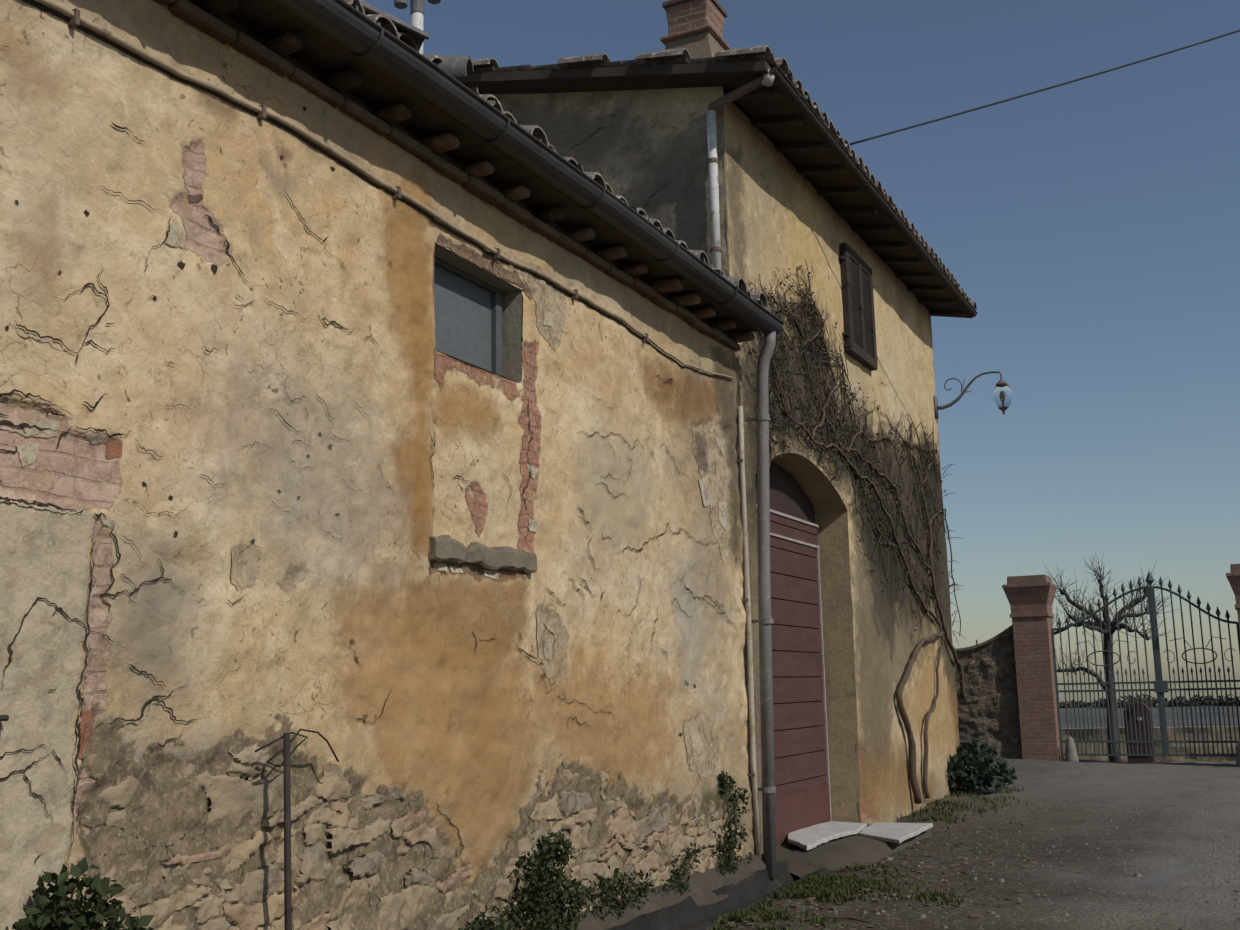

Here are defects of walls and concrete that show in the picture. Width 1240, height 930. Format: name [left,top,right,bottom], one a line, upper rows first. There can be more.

crack [15,270,116,365]
crack [102,186,174,299]
spalling [166,140,232,274]
crack [205,215,380,353]
crack [283,189,349,275]
crack [242,384,397,494]
spalling [434,235,567,553]
spalling [0,397,123,830]
crack [0,389,251,878]
crack [473,393,741,730]
damp [342,581,526,876]